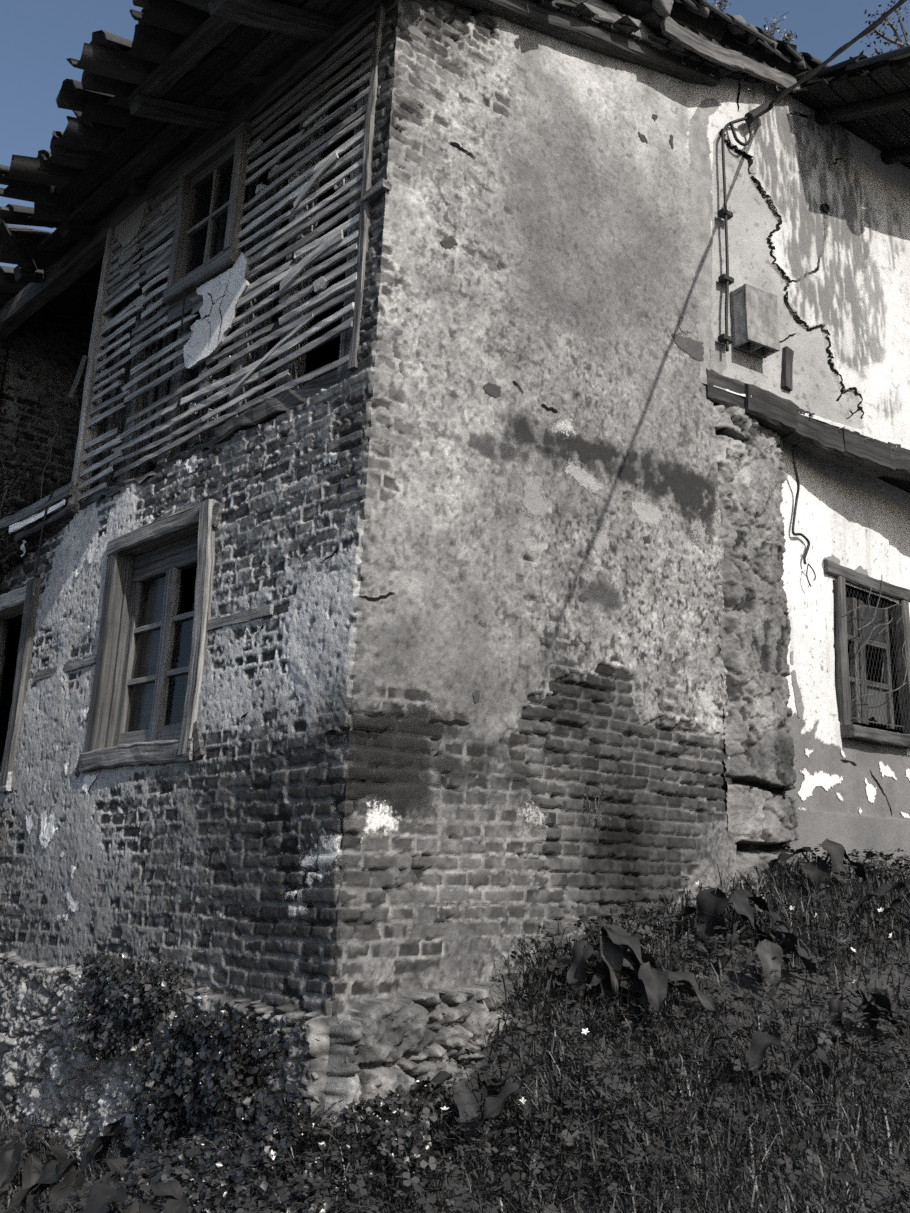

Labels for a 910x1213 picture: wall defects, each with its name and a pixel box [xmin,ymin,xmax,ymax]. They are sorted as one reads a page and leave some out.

crack [720,79,864,419]
spalling [189,253,250,369]
water stain [454,416,717,542]
peeling [74,546,94,577]
peeling [26,811,79,921]
peeling [81,774,98,794]
flaking render [94,774,177,848]
peeling [782,714,910,820]